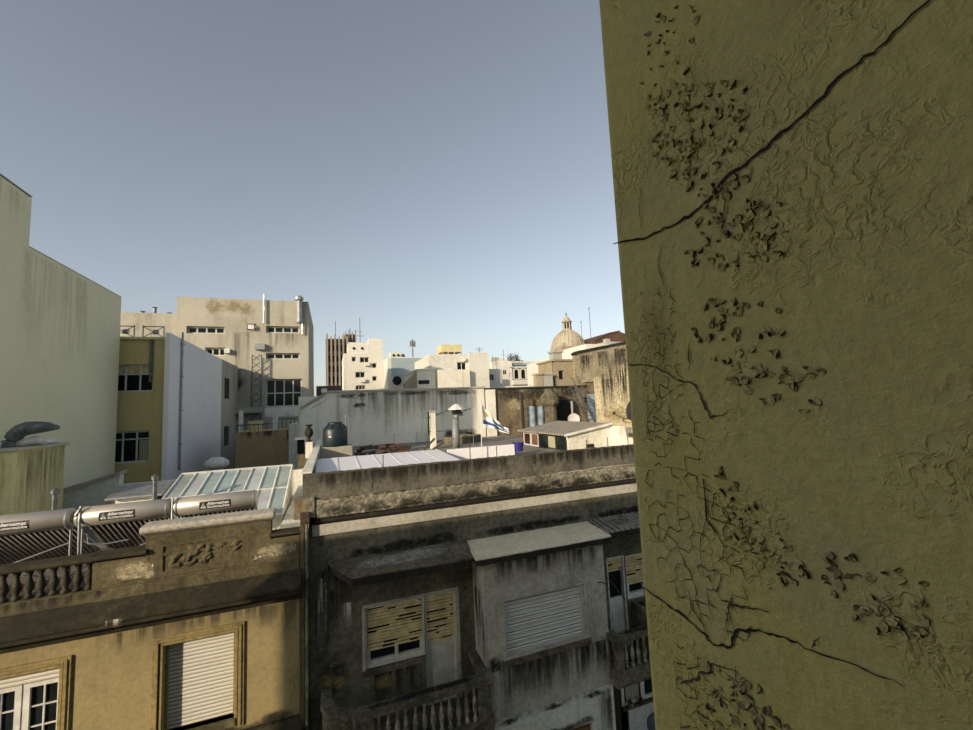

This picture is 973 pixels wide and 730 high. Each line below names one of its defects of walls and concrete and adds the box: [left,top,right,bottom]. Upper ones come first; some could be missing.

crack [553,0,930,730]
water stain [433,472,633,502]
water stain [491,640,609,691]